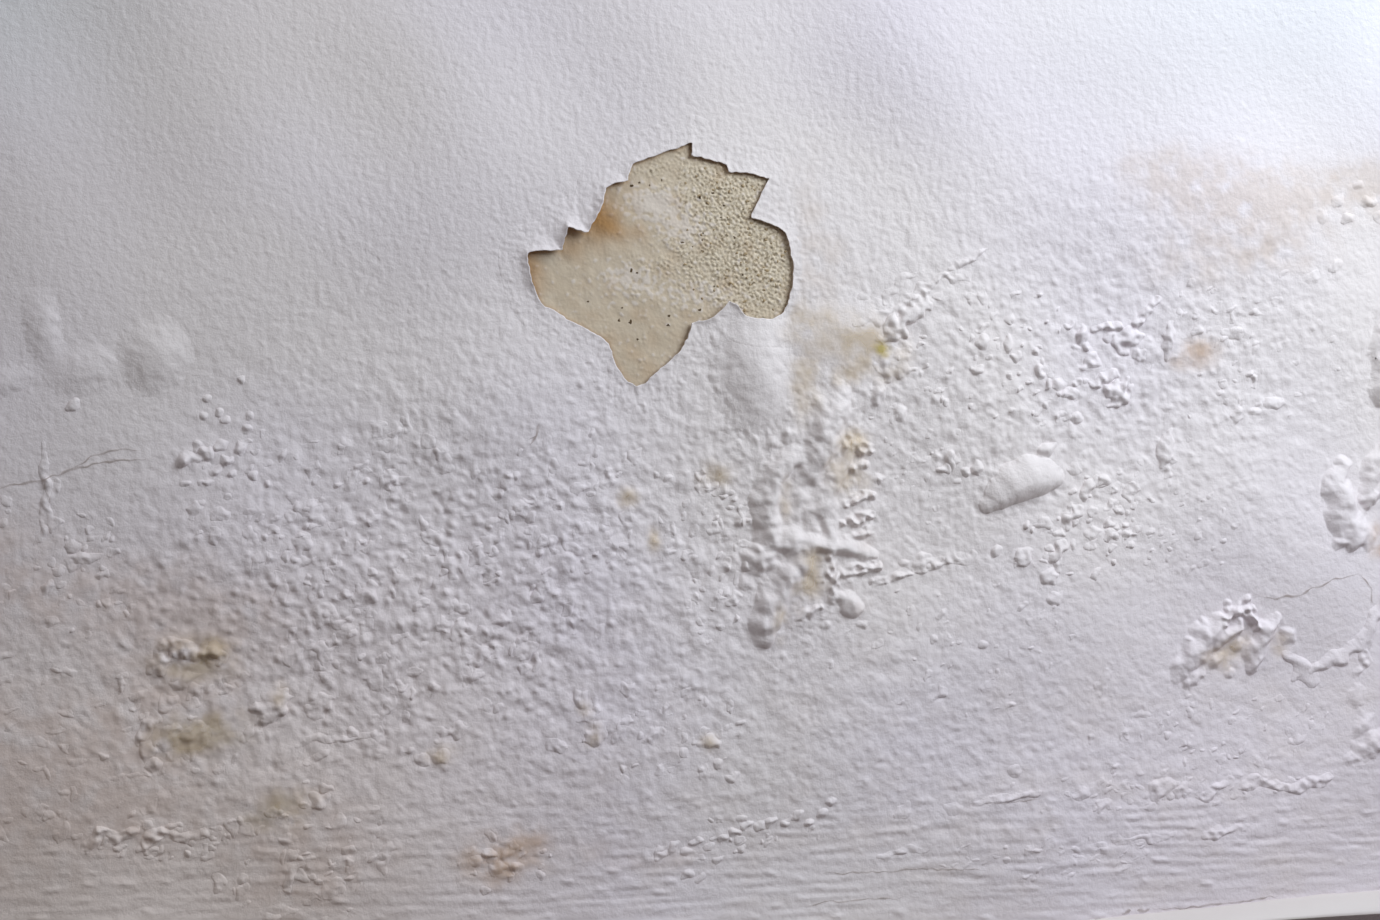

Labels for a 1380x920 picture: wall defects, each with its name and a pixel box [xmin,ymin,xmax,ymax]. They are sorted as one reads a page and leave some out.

peeling [498,114,820,415]